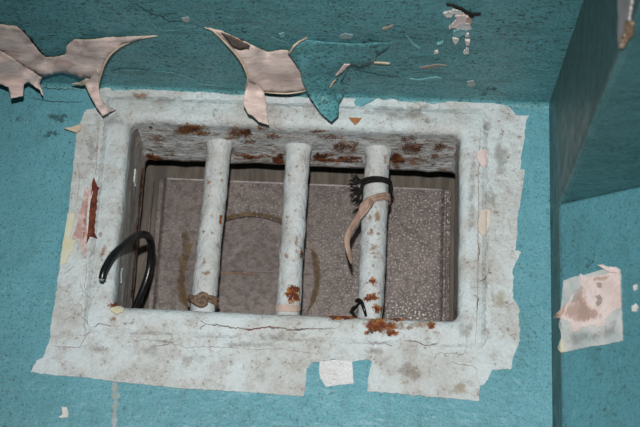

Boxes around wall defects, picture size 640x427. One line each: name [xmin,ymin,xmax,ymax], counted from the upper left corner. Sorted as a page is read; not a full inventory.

spalling [443,3,481,55]
rust [176,123,210,136]
rust [229,125,282,145]
rust [310,129,363,163]
rust [385,135,446,167]
peeling [0,24,529,401]
crack [52,263,109,348]
crack [132,329,318,354]
crack [198,318,331,331]
rust [285,285,300,304]
rust [363,293,411,337]
spalling [553,265,624,353]